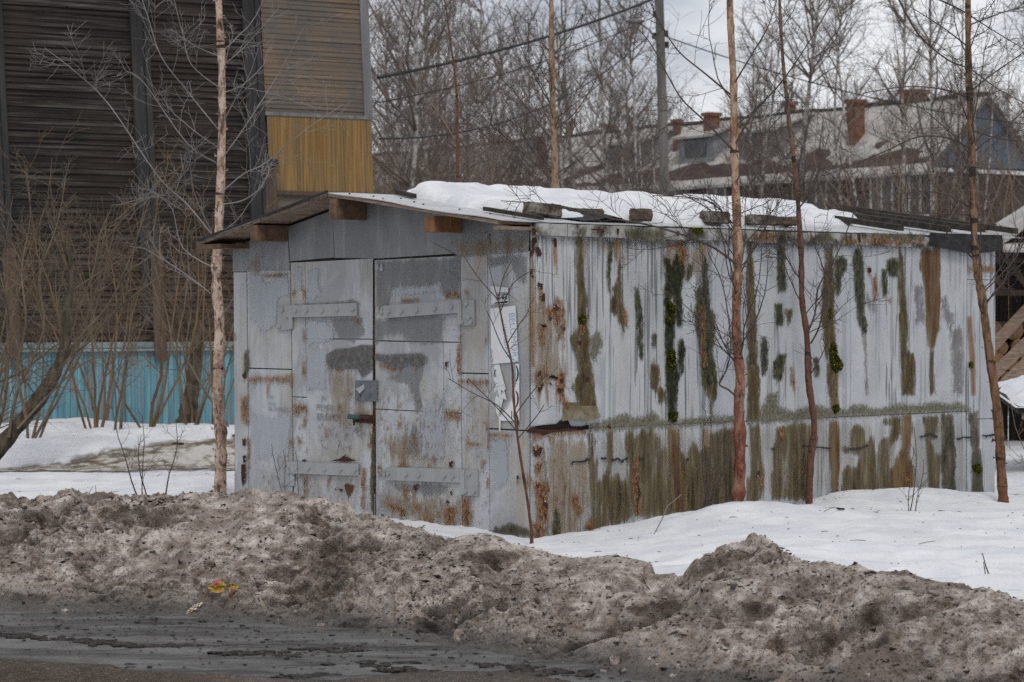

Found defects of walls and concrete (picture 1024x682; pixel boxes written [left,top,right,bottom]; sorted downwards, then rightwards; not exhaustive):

rust [296,333,511,527]
rust [529,265,585,413]